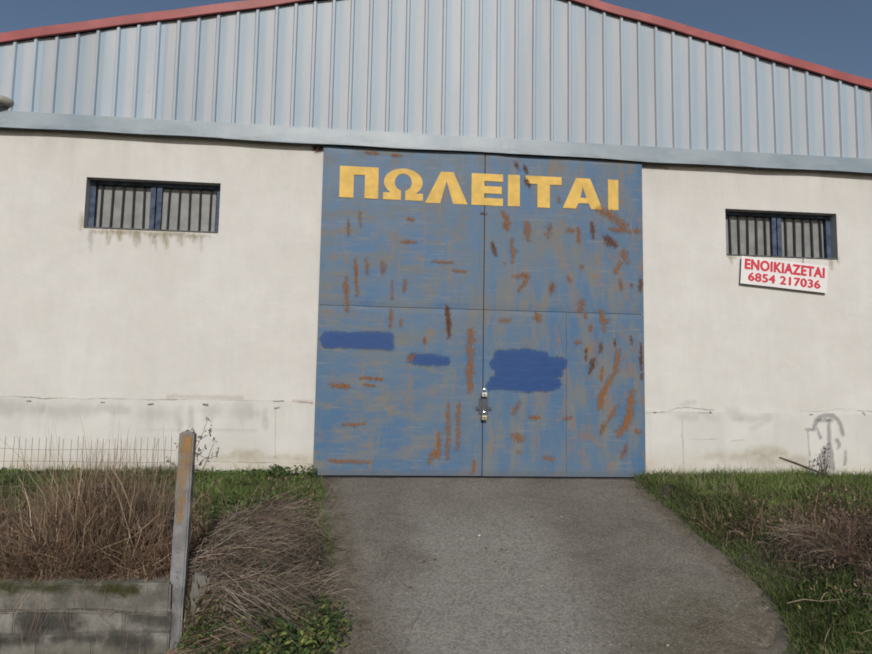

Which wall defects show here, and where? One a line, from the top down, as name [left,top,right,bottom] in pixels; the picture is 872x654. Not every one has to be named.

rust [502,212,531,262]
rust [568,207,644,292]
rust [343,260,359,311]
rust [466,328,476,393]
rust [574,340,640,438]
rust [427,403,461,464]